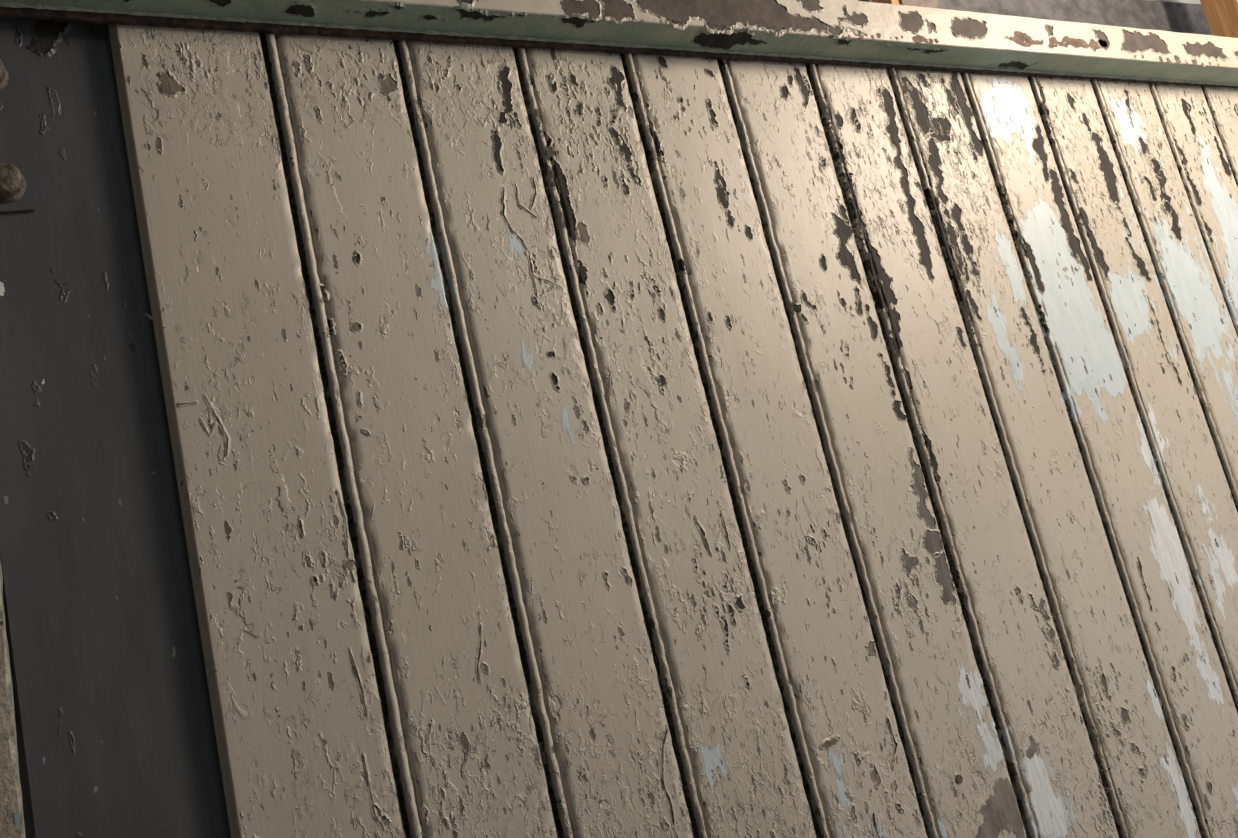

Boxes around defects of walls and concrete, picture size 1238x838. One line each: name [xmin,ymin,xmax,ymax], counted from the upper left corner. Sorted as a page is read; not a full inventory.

peeling [157,42,210,98]
peeling [327,48,399,106]
peeling [419,5,527,23]
peeling [690,26,769,50]
peeling [490,55,733,395]
peeling [707,156,754,242]
peeling [521,339,575,445]
peeling [779,59,1238,619]
peeling [1135,402,1238,713]
peeling [819,734,904,838]
peeling [954,662,1073,838]
peeling [1014,584,1197,838]